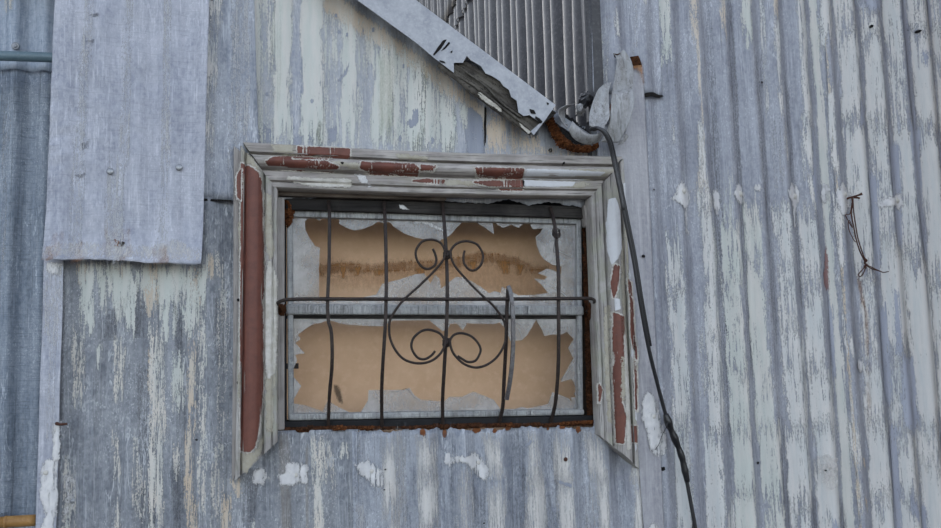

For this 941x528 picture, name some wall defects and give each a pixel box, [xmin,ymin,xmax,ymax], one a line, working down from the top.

peeling [39,262,78,528]
peeling [71,0,614,528]
rust [280,228,594,433]
rust [545,116,599,153]
peeling [583,183,640,528]
peeling [630,466,643,528]
peeling [659,0,673,67]
peeling [665,0,941,528]